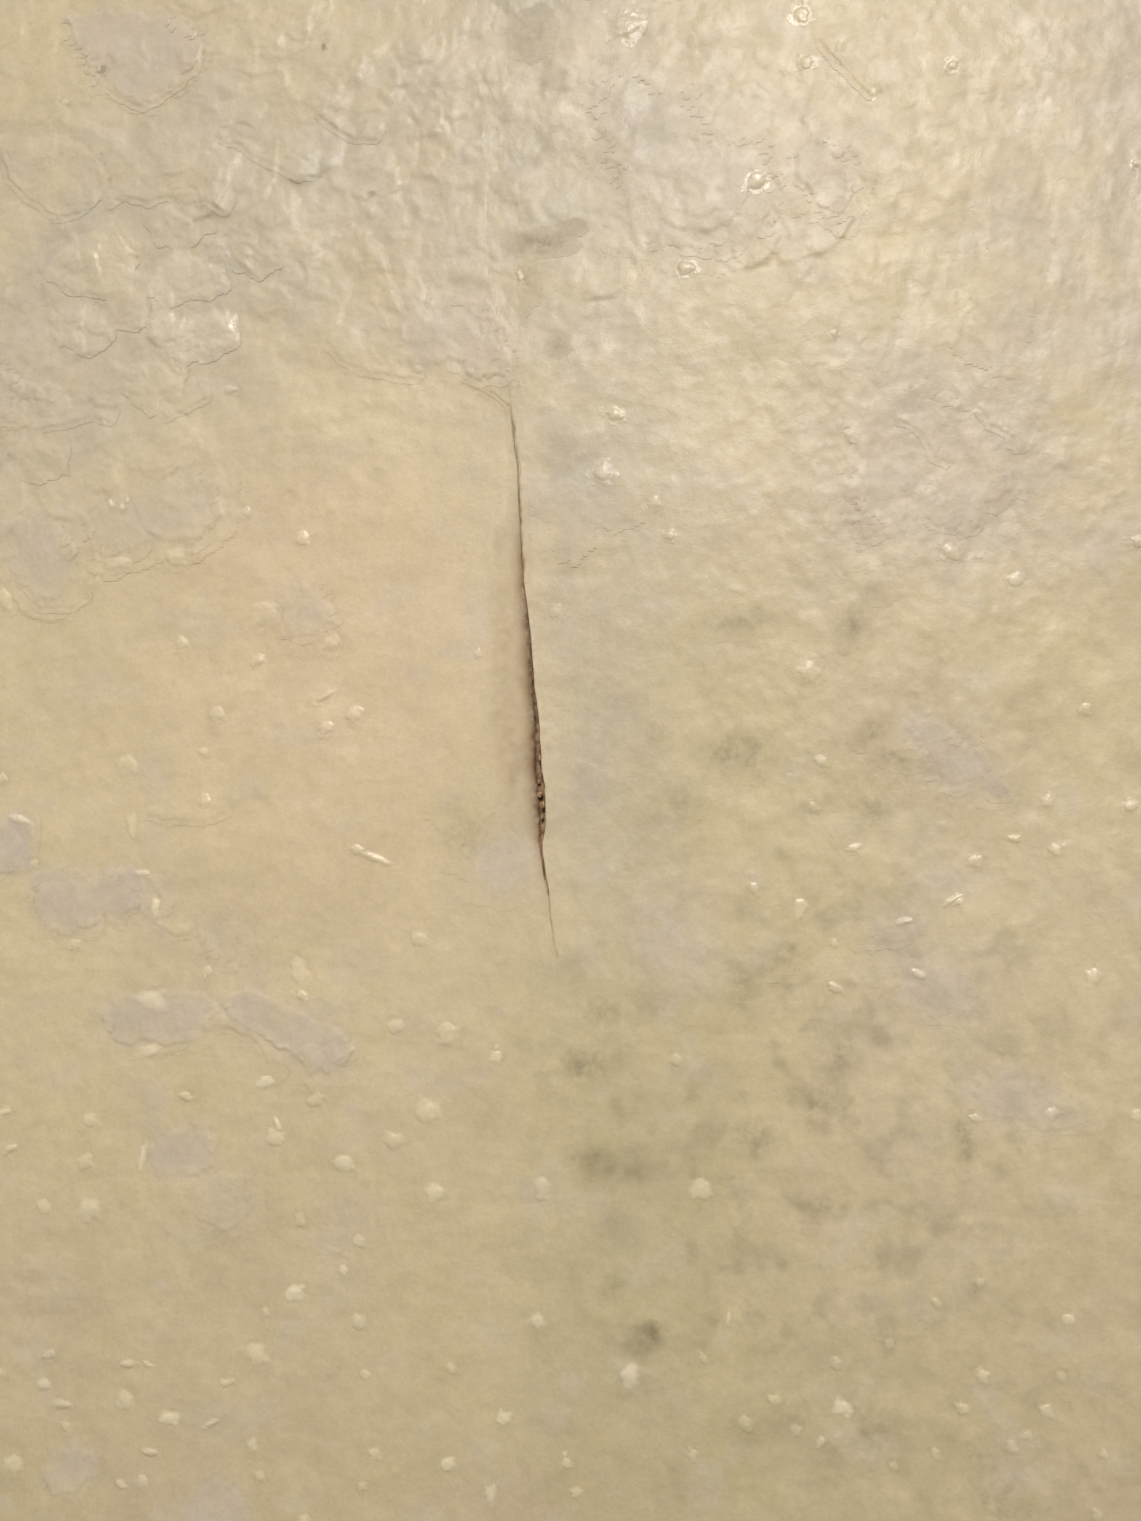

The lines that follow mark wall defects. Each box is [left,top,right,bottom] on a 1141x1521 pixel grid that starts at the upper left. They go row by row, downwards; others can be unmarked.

peeling [51,0,216,117]
crack [458,373,565,963]